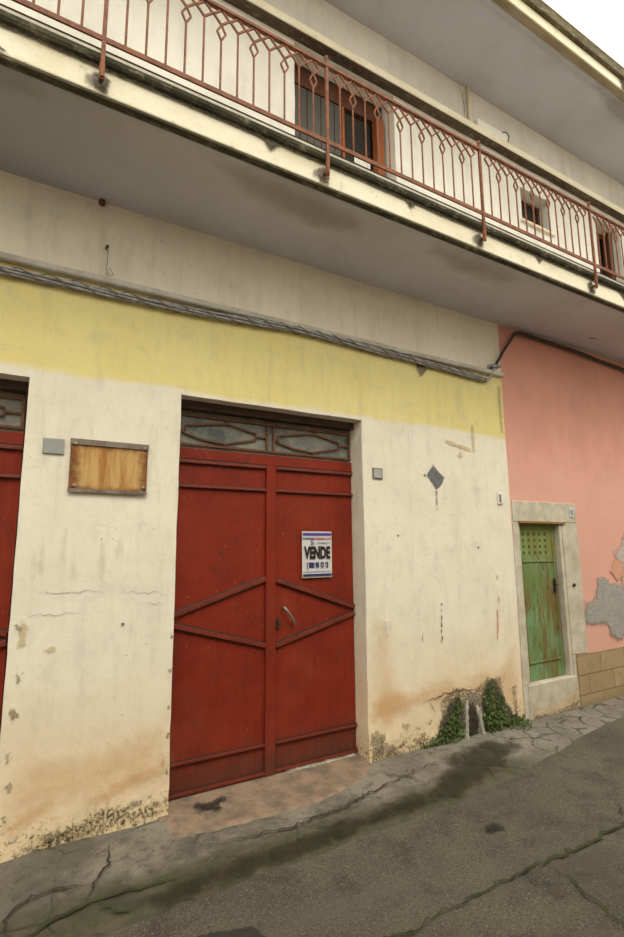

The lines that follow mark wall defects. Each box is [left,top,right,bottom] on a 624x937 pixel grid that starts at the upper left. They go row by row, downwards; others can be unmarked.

leakage [0,21,624,297]
flaking render [584,537,624,640]
leakage [376,677,519,757]
leakage [23,801,161,852]